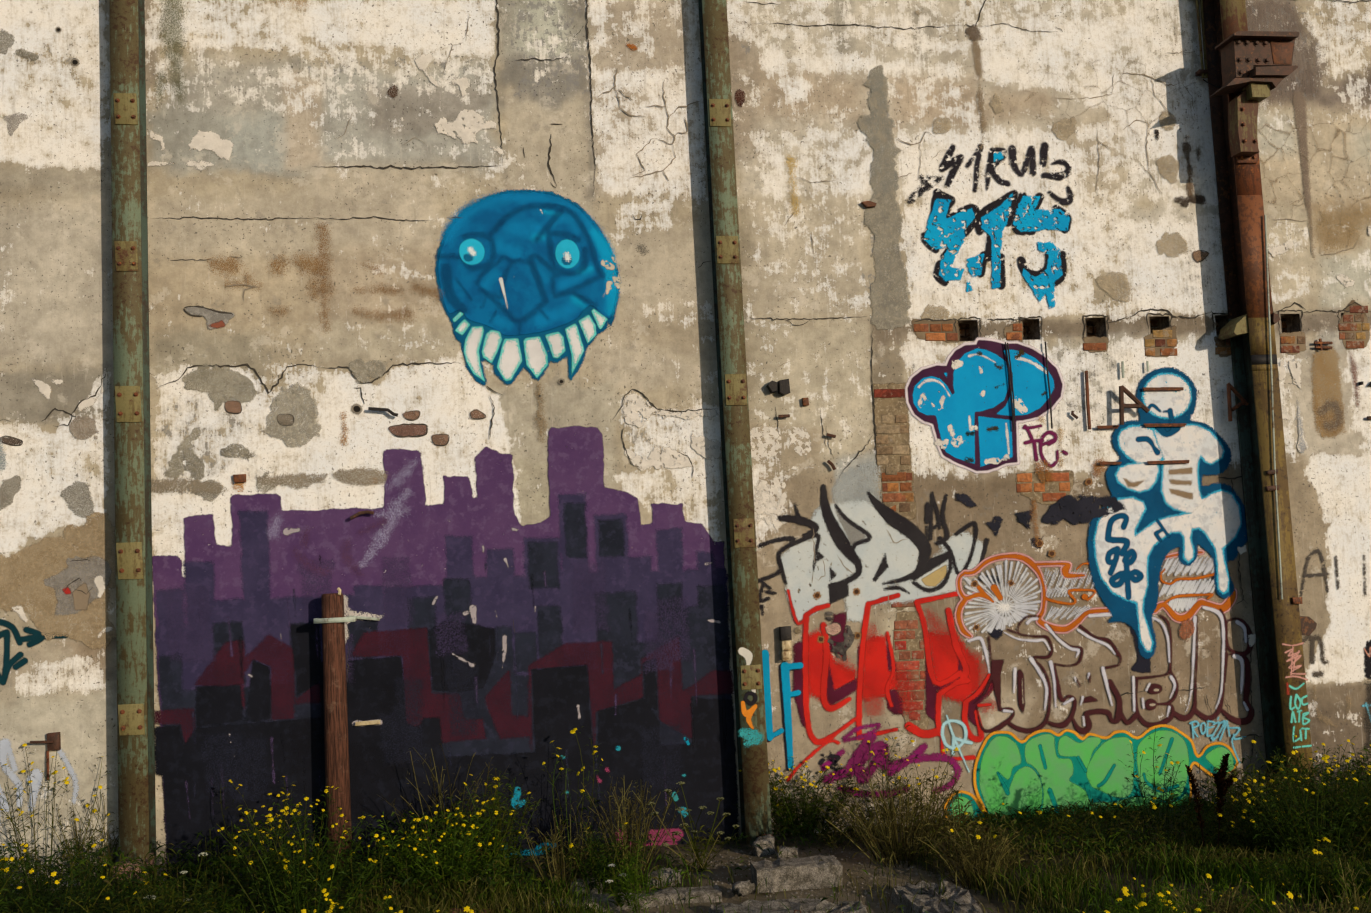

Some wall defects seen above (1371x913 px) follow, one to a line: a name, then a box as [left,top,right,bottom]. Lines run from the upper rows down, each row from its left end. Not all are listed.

peeling [414,54,503,155]
crack [313,0,700,194]
peeling [147,130,234,170]
corrosion [1181,135,1201,197]
crack [1258,115,1371,258]
flaking render [1082,314,1109,353]
flaking render [1144,313,1178,357]
peeling [1278,310,1307,389]
flaking render [1337,274,1370,350]
spalling [0,436,23,446]
flaking render [871,383,978,521]
spalling [0,481,116,650]